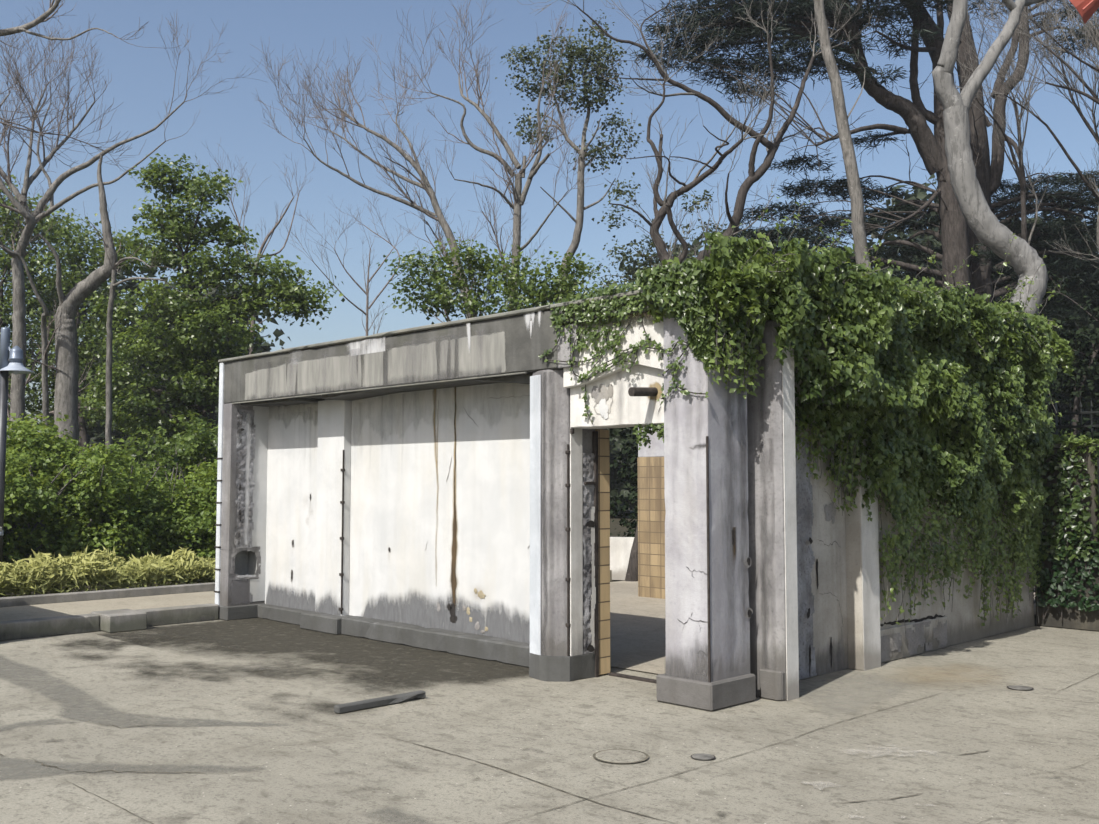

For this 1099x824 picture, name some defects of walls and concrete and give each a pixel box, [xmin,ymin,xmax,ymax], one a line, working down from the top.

peeling [230,331,506,605]
rust [437,387,457,623]
spalling [583,453,596,654]
water stain [64,617,529,691]
water stain [266,585,340,615]
water stain [363,593,530,643]
crack [880,614,947,662]